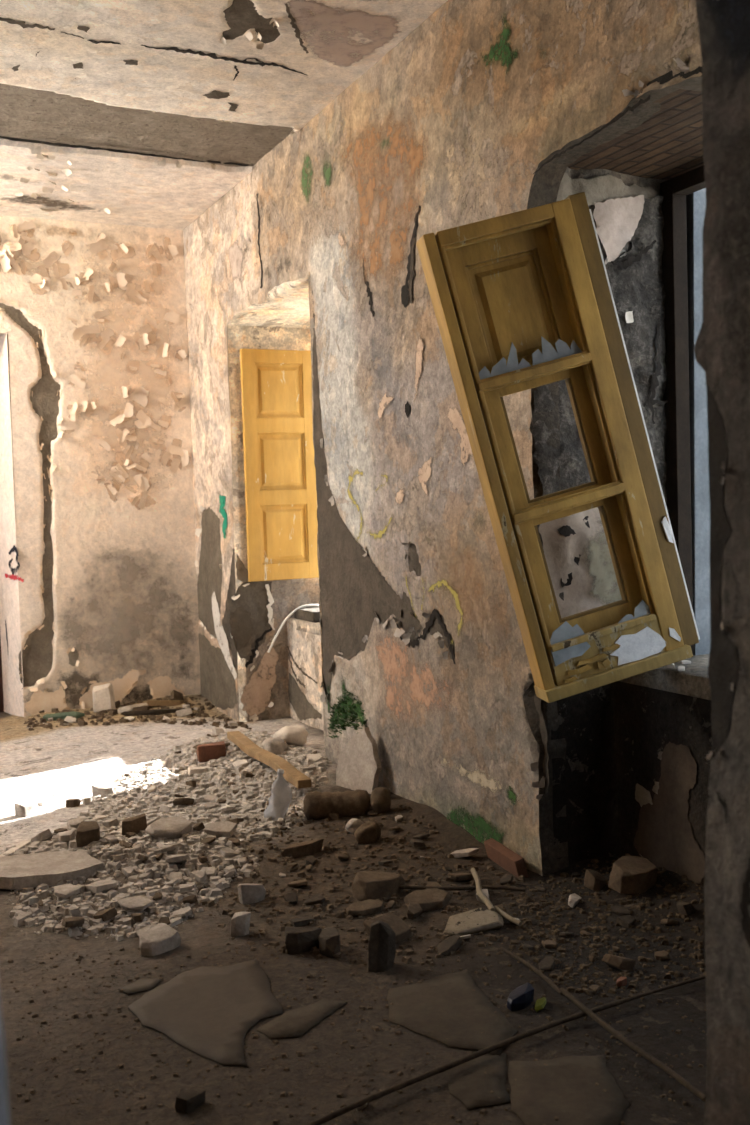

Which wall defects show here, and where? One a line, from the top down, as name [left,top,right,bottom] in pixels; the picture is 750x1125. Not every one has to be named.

crack [0,17,308,80]
flaking render [220,0,280,50]
crack [533,95,650,174]
flaking render [0,83,296,509]
flaking render [194,313,455,721]
peeling [539,507,622,618]
flaking render [556,173,739,885]
damp [63,554,194,670]
damp [50,671,99,708]
peeling [25,669,186,715]
damp [125,685,153,701]
crack [740,858,750,947]